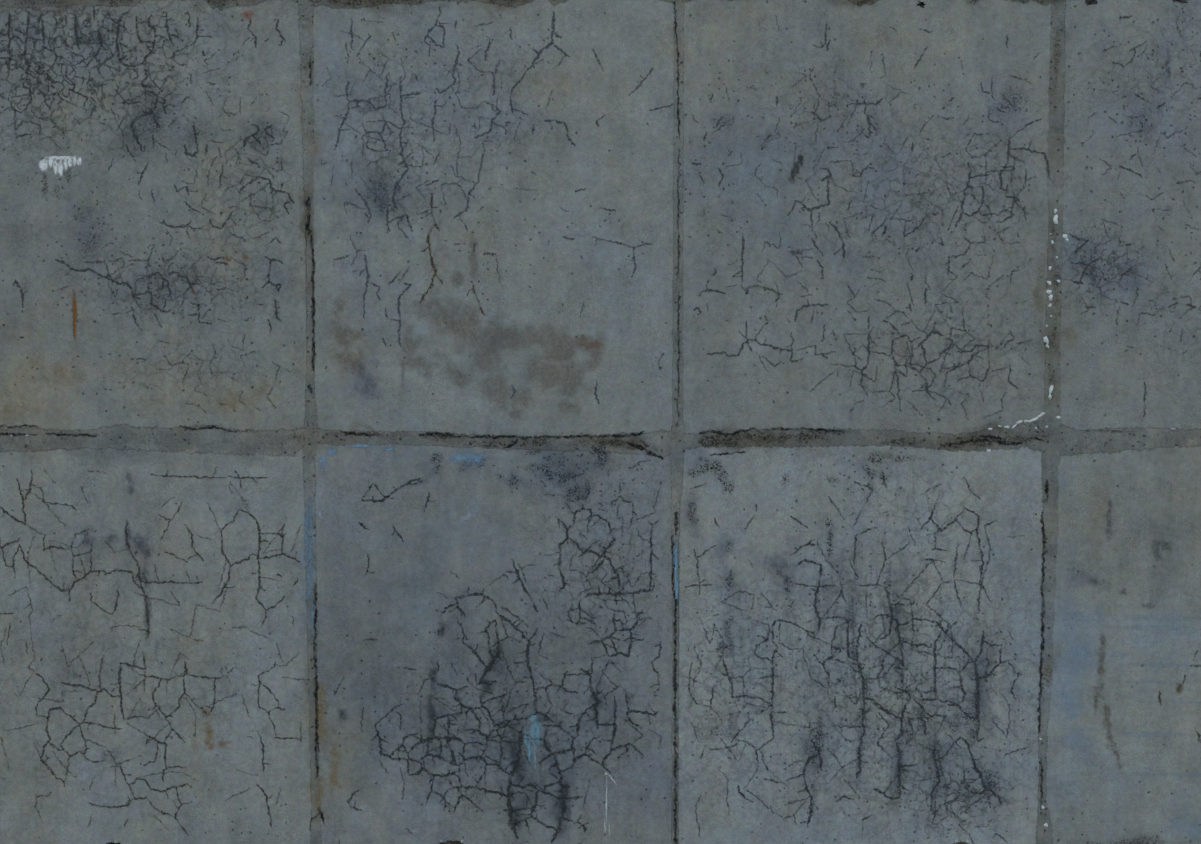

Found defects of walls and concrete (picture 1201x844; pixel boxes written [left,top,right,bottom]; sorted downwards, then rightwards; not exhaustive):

crack [0,6,605,432]
crack [563,1,1050,456]
crack [1069,16,1201,348]
crack [0,424,97,437]
crack [419,431,663,463]
crack [0,469,345,833]
crack [309,790,362,844]
crack [359,472,1049,844]